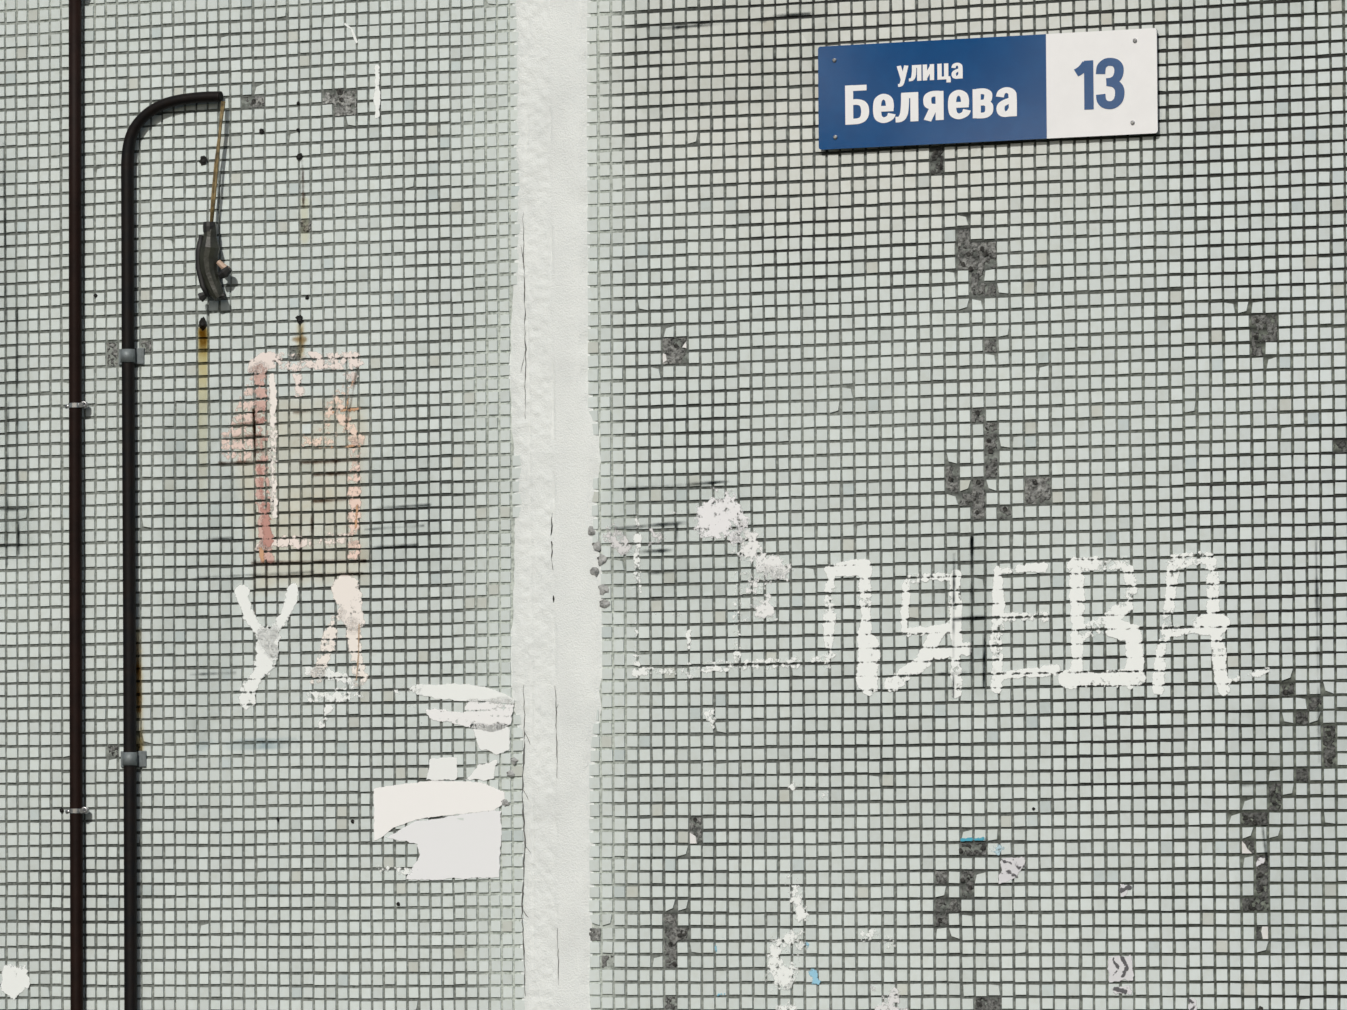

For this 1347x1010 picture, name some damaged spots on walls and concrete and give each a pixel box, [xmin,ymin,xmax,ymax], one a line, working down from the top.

peeling [323,88,357,116]
peeling [931,147,943,174]
peeling [958,229,996,297]
peeling [1251,314,1277,356]
peeling [946,409,1011,520]
peeling [1025,477,1051,504]
peeling [1281,683,1294,696]
peeling [1295,697,1336,767]
peeling [1242,769,1308,825]
peeling [935,843,987,926]
peeling [1242,841,1269,939]
peeling [665,914,689,968]